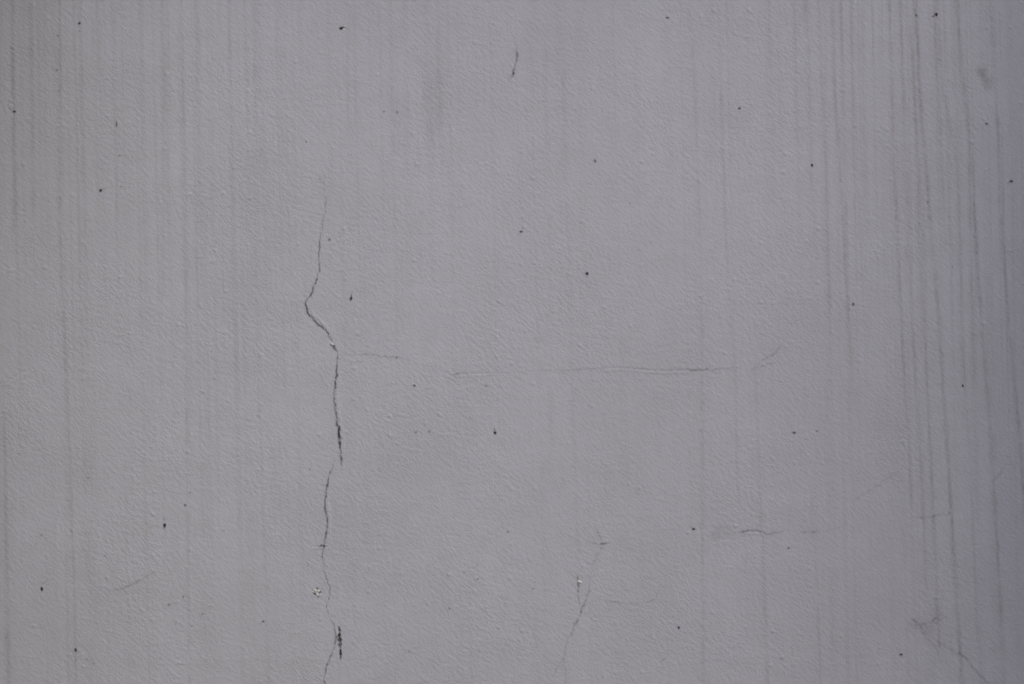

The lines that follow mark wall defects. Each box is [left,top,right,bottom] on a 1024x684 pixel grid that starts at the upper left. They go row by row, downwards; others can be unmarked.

crack [305,280,345,458]
crack [313,484,332,550]
crack [334,627,342,655]